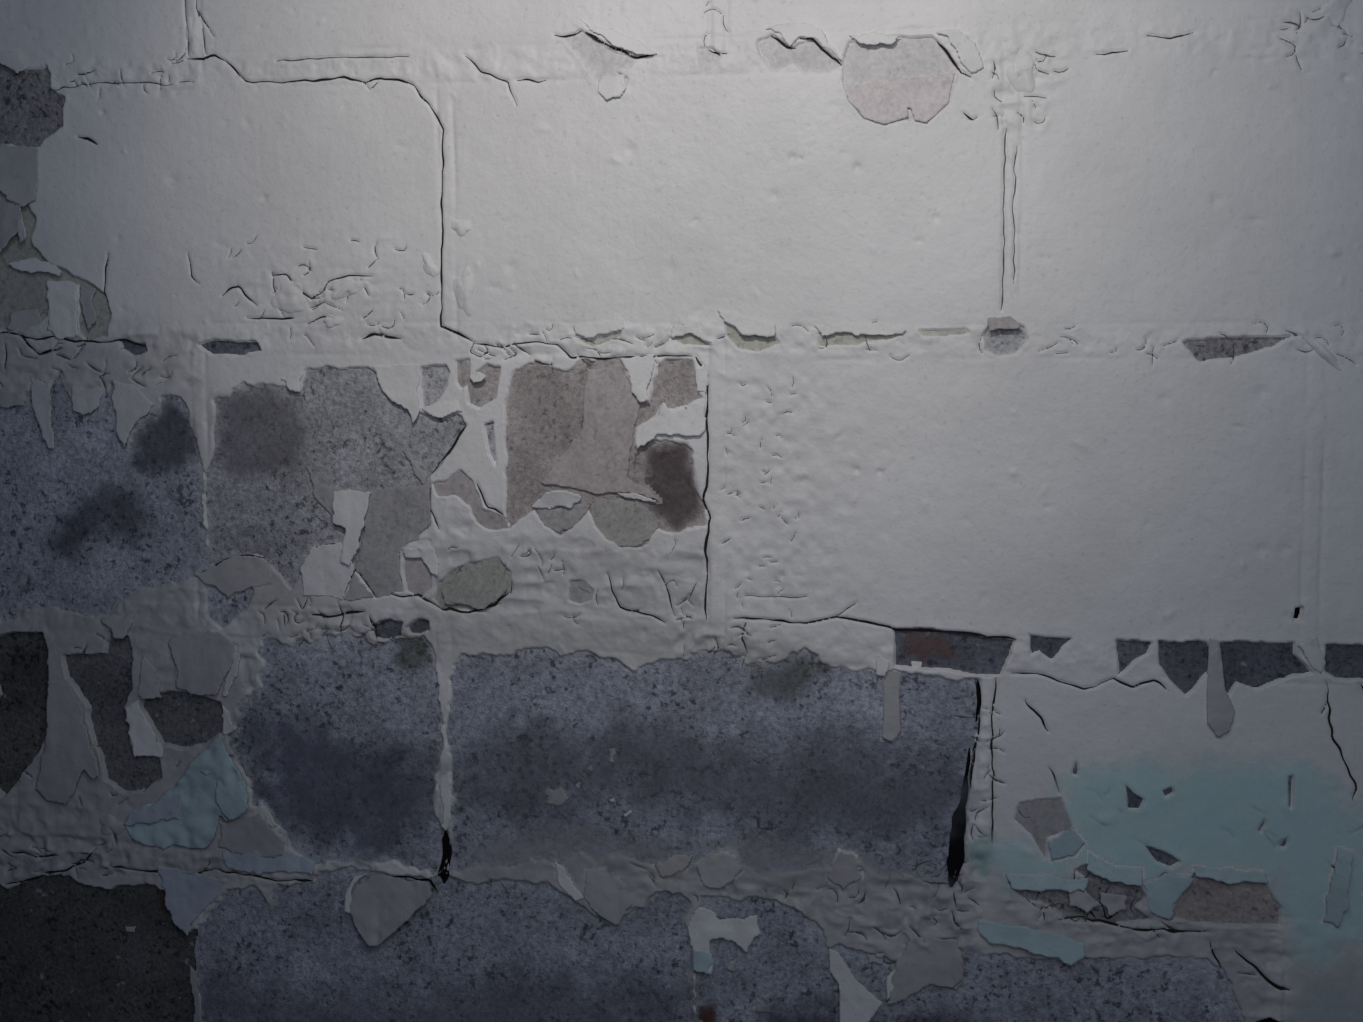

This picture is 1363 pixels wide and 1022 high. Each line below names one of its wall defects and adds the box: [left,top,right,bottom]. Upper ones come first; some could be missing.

peeling [758,22,983,125]
crack [1097,32,1193,55]
peeling [0,49,147,355]
crack [937,41,1067,353]
crack [53,0,1016,666]
peeling [718,309,779,351]
leakage [651,448,695,526]
crack [393,830,452,892]
peeling [0,316,1296,1022]
crack [722,673,1169,972]
peeling [1116,636,1363,737]
crack [1321,682,1363,829]